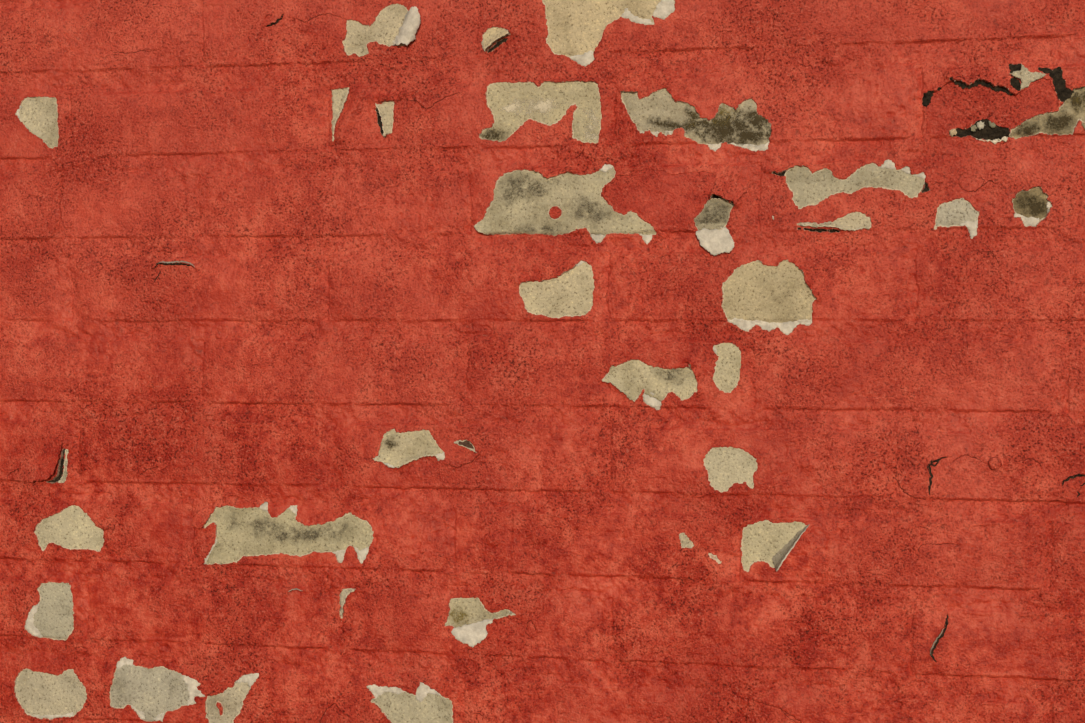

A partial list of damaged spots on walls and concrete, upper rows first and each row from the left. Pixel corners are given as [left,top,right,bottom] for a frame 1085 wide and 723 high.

peeling [542,0,675,66]
peeling [474,164,656,244]
peeling [773,159,929,209]
peeling [519,261,595,318]
peeling [722,260,816,335]
peeling [35,505,109,551]
peeling [191,502,374,564]
peeling [741,520,810,572]
peeling [25,582,74,640]
peeling [15,669,87,720]
peeling [110,657,259,723]
peeling [367,682,453,723]